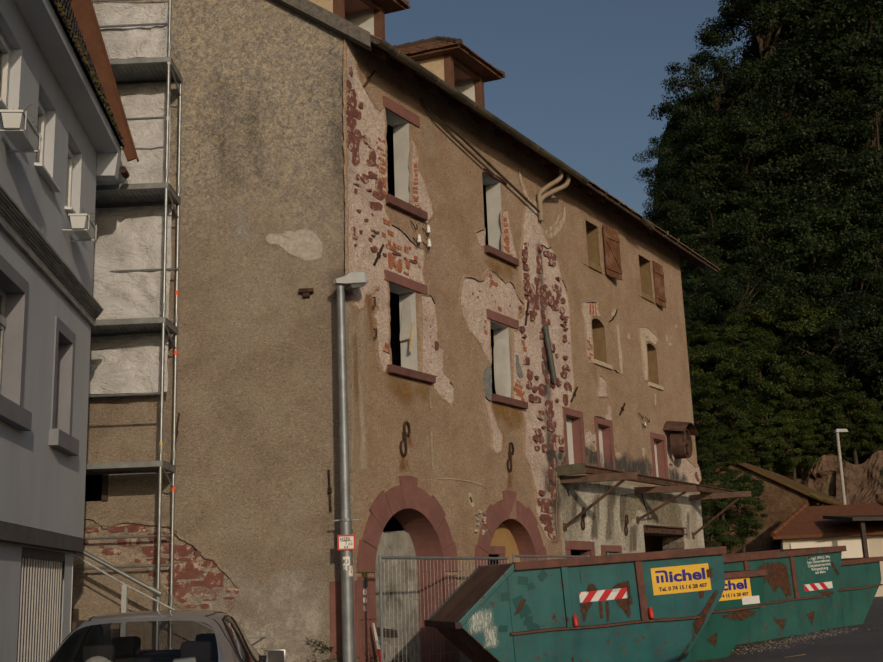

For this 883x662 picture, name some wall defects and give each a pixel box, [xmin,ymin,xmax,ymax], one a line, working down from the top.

peeling [343,36,455,410]
peeling [458,197,575,543]
damp [545,430,566,540]
peeling [584,427,597,453]
peeling [597,374,613,421]
damp [592,483,637,551]
peeling [581,298,677,383]
peeling [73,518,243,613]